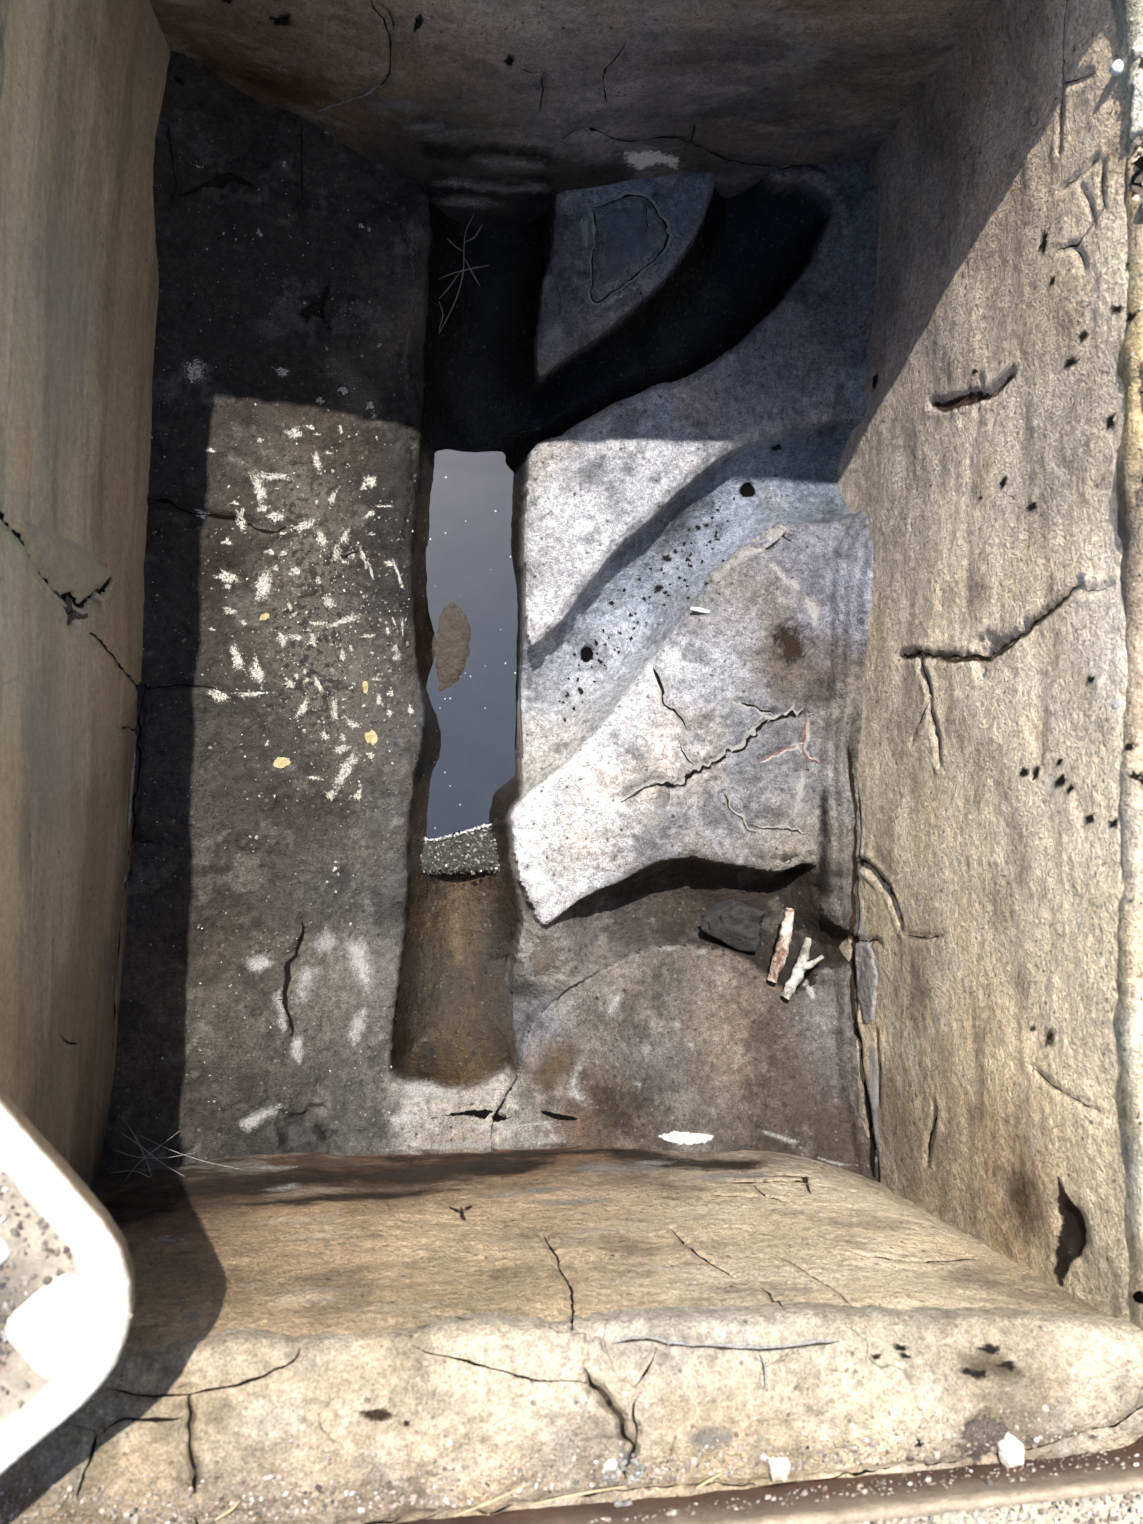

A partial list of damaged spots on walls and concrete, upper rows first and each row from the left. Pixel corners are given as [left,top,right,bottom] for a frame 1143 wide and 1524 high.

crack [900,583,1110,761]
crack [0,512,223,1050]
crack [277,922,305,1036]
crack [619,665,939,1177]
crack [67,1346,301,1524]
crack [364,1512,439,1524]
crack [413,1227,1143,1514]